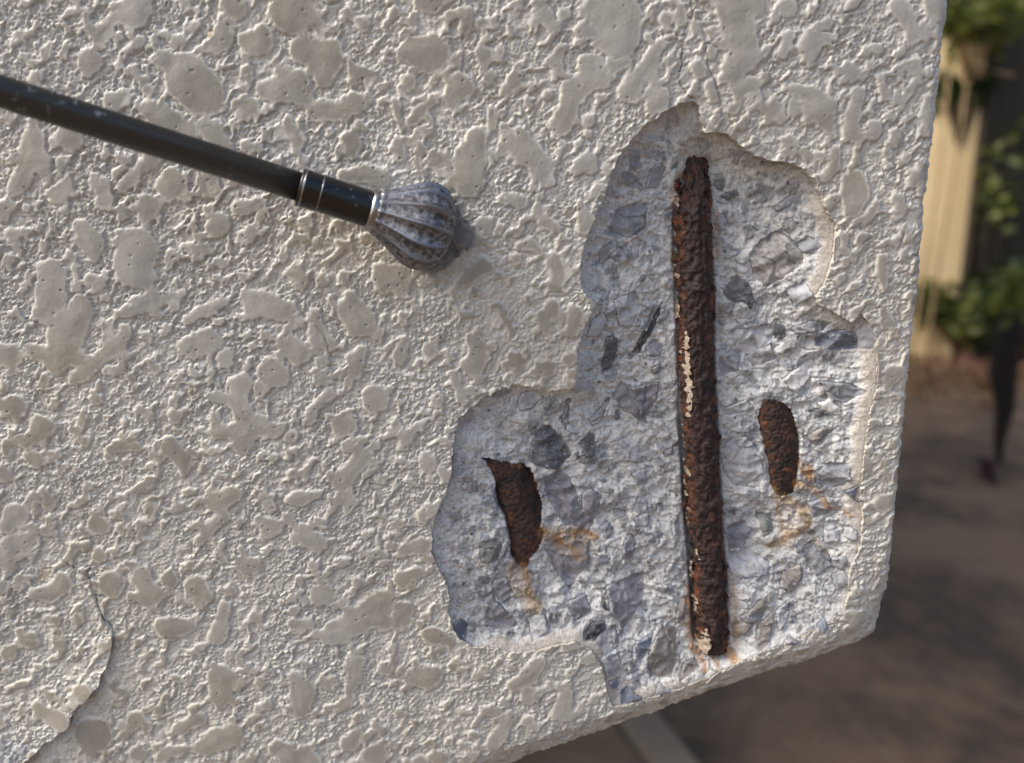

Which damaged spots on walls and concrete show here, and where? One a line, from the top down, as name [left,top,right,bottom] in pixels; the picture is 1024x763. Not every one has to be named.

spalling [431,101,882,707]